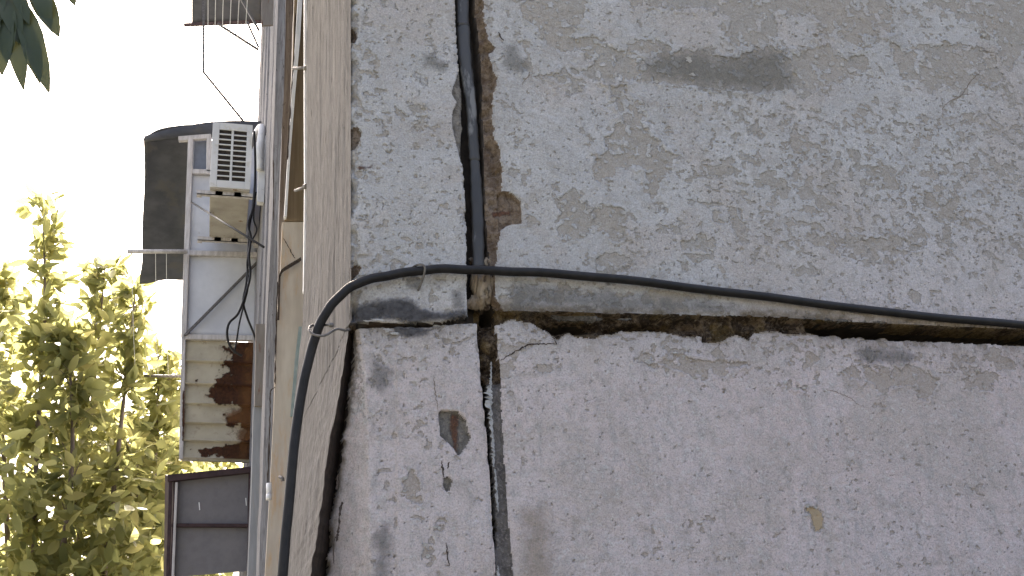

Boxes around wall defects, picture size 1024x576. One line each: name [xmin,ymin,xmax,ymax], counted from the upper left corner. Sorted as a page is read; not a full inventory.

spalling [452,0,522,328]
water stain [350,299,467,337]
spalling [542,326,587,336]
spalling [805,324,1024,346]
rust [182,342,253,459]
spalling [439,411,471,455]
peeling [804,504,825,533]